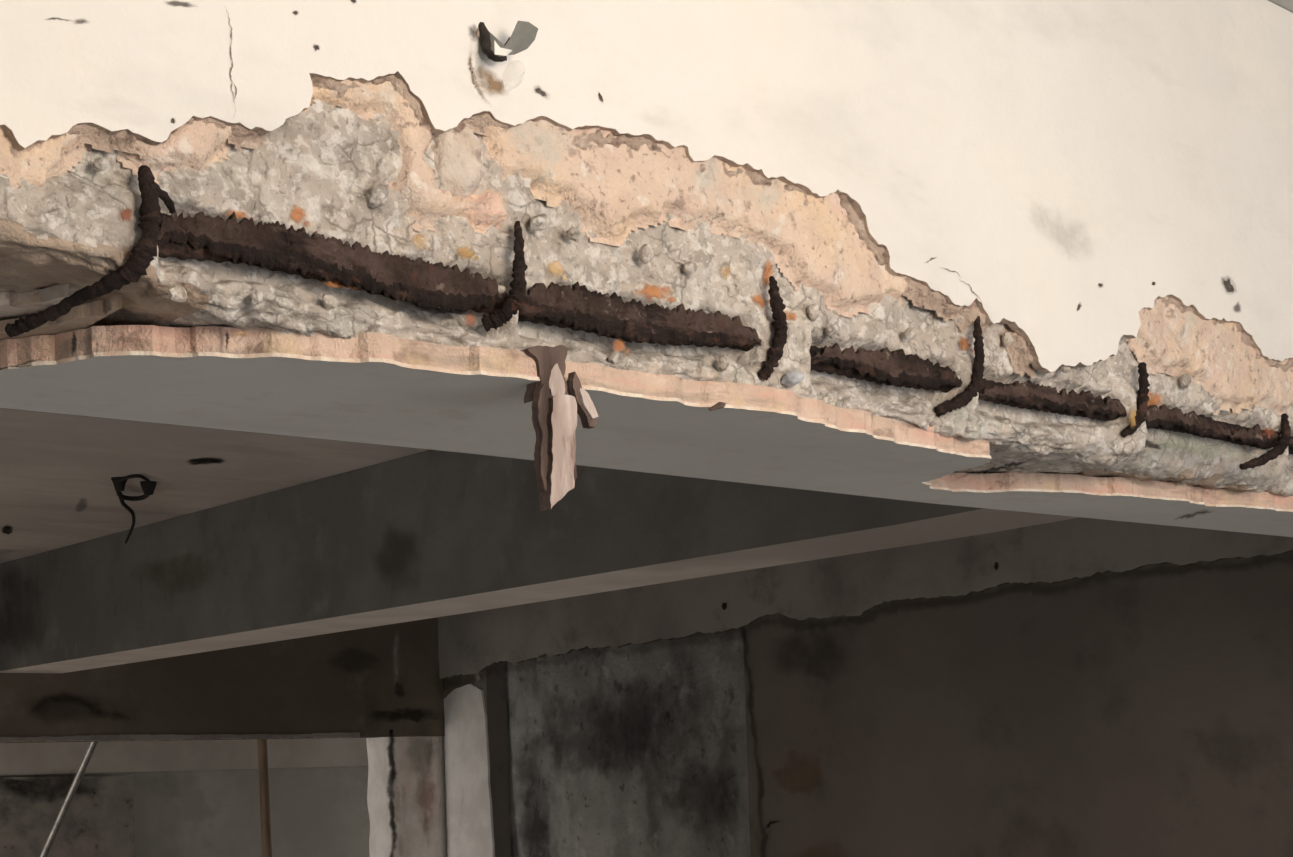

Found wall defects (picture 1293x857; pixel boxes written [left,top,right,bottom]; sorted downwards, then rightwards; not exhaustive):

crack [229,18,237,99]
corrosion [291,205,309,226]
spalling [0,75,1293,497]
corrosion [641,285,675,302]
corrosion [753,263,773,307]
corrosion [1129,393,1161,427]
crack [387,729,397,857]